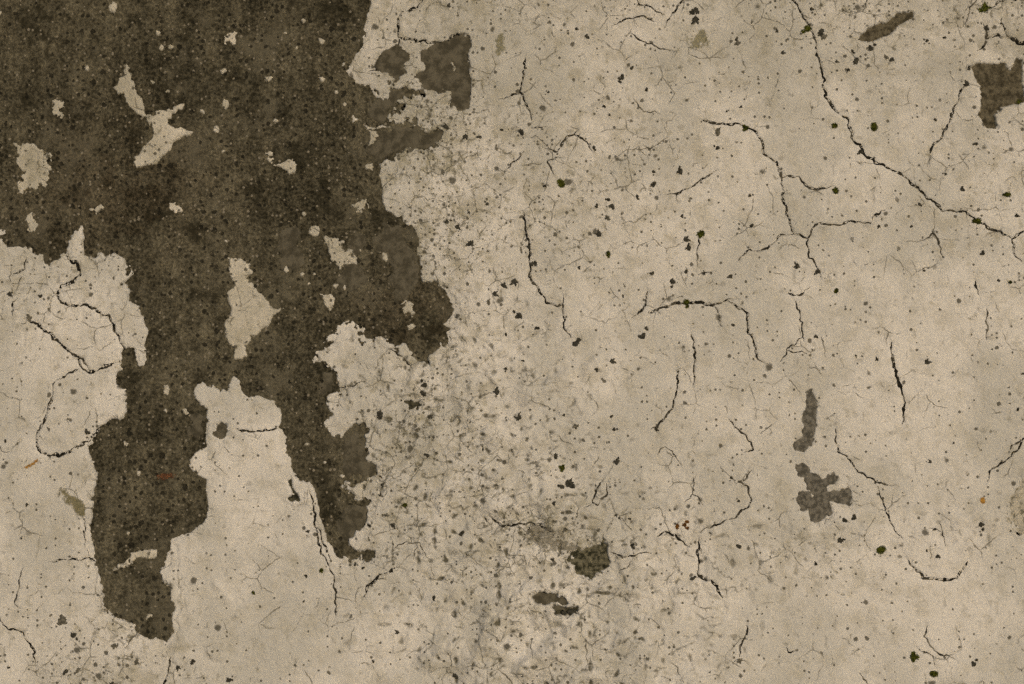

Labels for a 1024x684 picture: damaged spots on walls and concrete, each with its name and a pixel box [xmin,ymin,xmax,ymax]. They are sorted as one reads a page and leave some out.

crack [501,58,592,176]
peeling [858,11,913,42]
crack [792,0,1024,262]
peeling [971,58,1024,129]
crack [11,256,126,458]
peeling [0,0,472,642]
crack [523,214,571,337]
crack [611,334,774,598]
crack [632,120,885,371]
peeling [793,389,852,523]
crack [890,343,906,424]
crack [834,428,968,582]